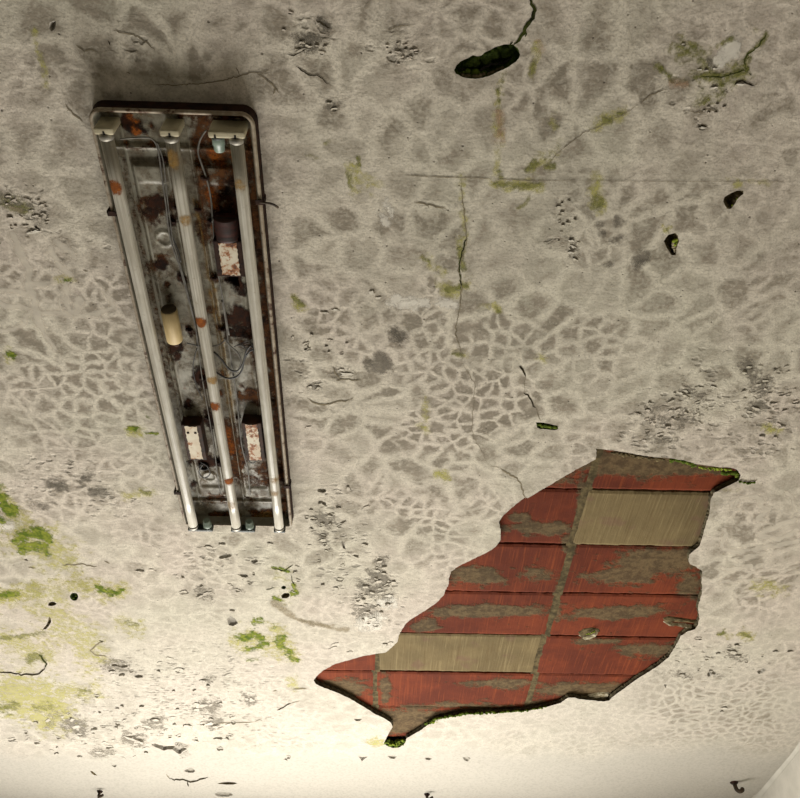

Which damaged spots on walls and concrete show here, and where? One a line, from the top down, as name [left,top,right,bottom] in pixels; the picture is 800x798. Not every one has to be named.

crack [458,0,537,72]
crack [692,35,766,86]
hole [723,191,743,209]
hole [664,233,679,255]
crack [404,89,667,497]
peeling [737,359,799,440]
efflorescence [0,518,24,533]
peeling [304,488,346,552]
spalling [316,385,756,759]
crack [0,655,47,676]